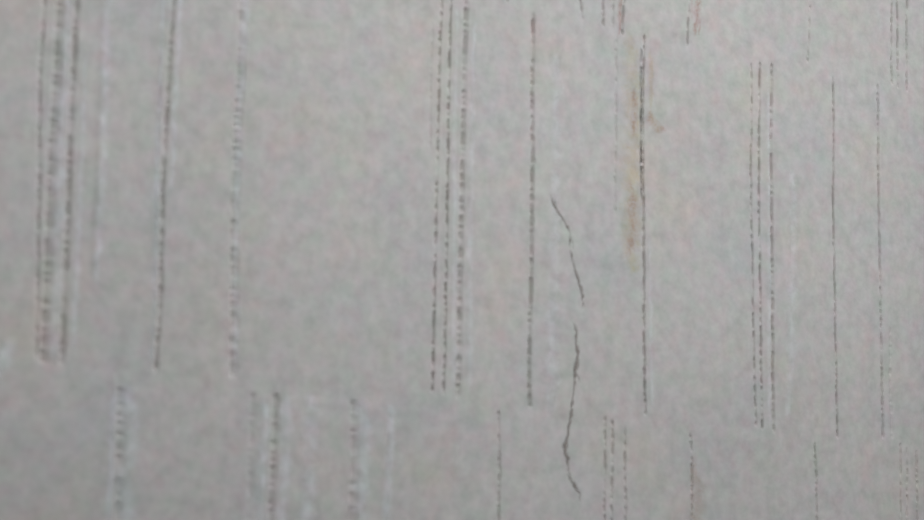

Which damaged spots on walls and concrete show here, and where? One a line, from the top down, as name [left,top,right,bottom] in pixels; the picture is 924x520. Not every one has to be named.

crack [551,198,584,305]
crack [562,325,581,496]